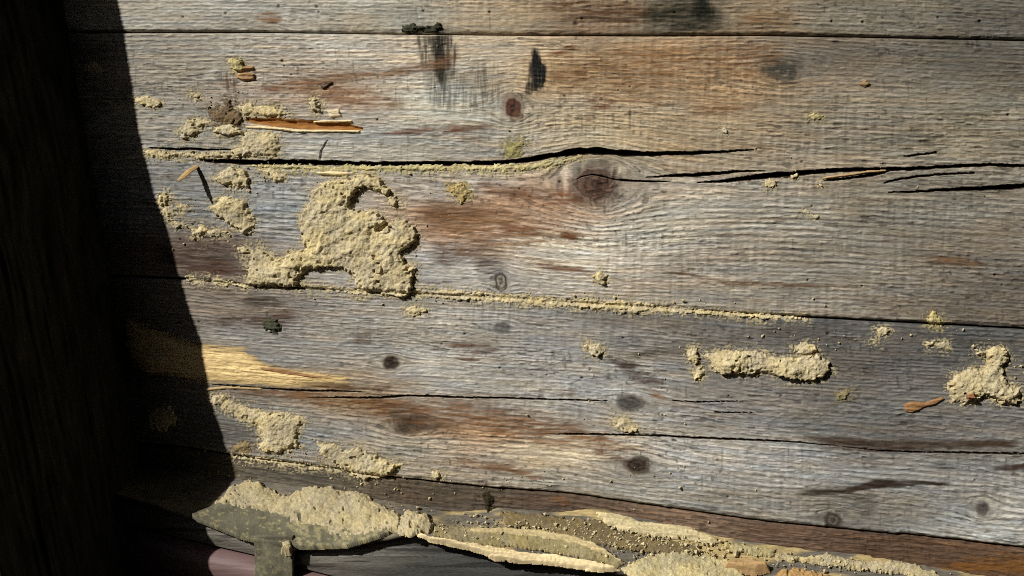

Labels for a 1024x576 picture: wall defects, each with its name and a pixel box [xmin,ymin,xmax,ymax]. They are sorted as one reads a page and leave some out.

peeling [236,66,256,82]
spalling [213,117,363,137]
crack [150,140,1024,193]
peeling [159,203,189,229]